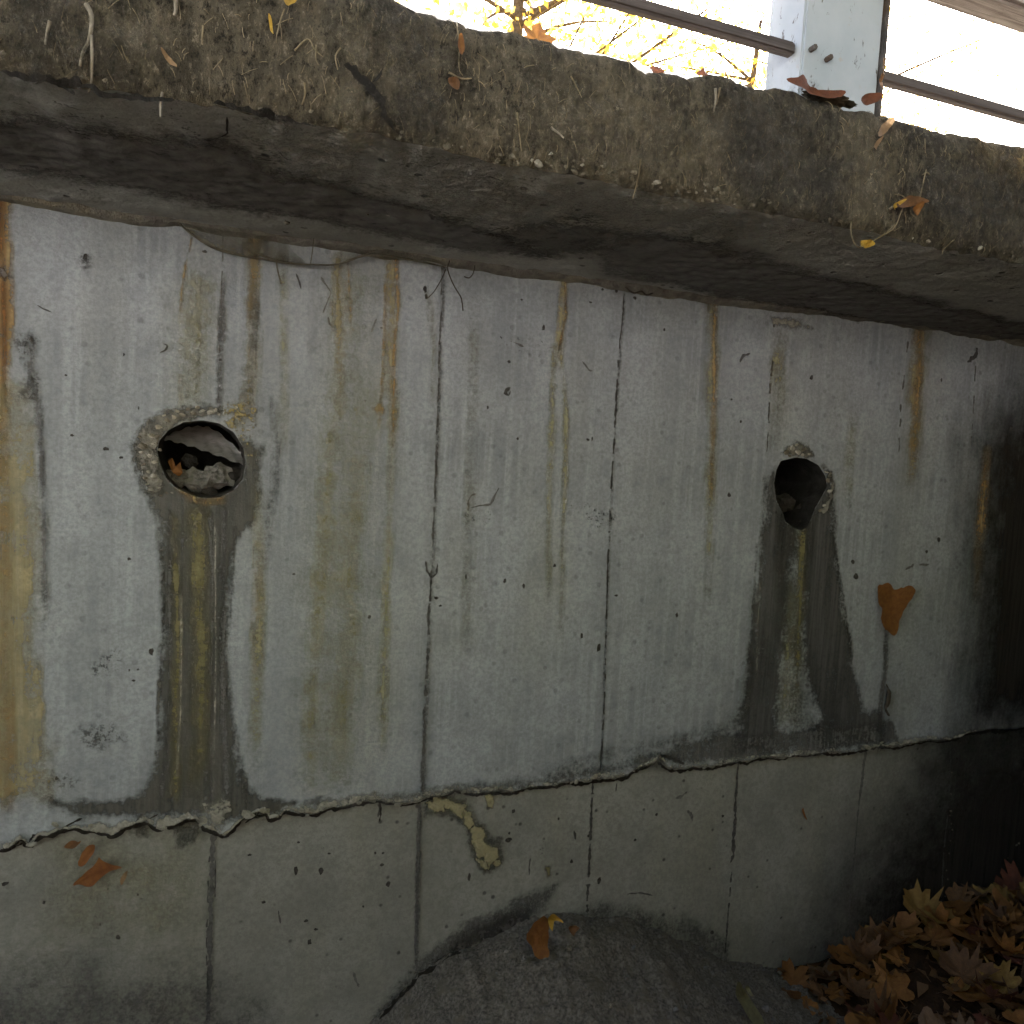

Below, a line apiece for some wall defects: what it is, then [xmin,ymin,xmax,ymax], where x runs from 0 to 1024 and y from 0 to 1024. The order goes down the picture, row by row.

rust [0,201,53,805]
damp [45,437,328,853]
spalling [137,402,257,496]
rust [374,259,400,432]
crack [0,265,1024,1023]
rust [547,281,569,543]
damp [435,471,898,796]
rust [704,304,718,506]
spalling [783,441,814,458]
rust [907,330,924,478]
damp [825,400,1024,948]
spalling [2,730,976,881]